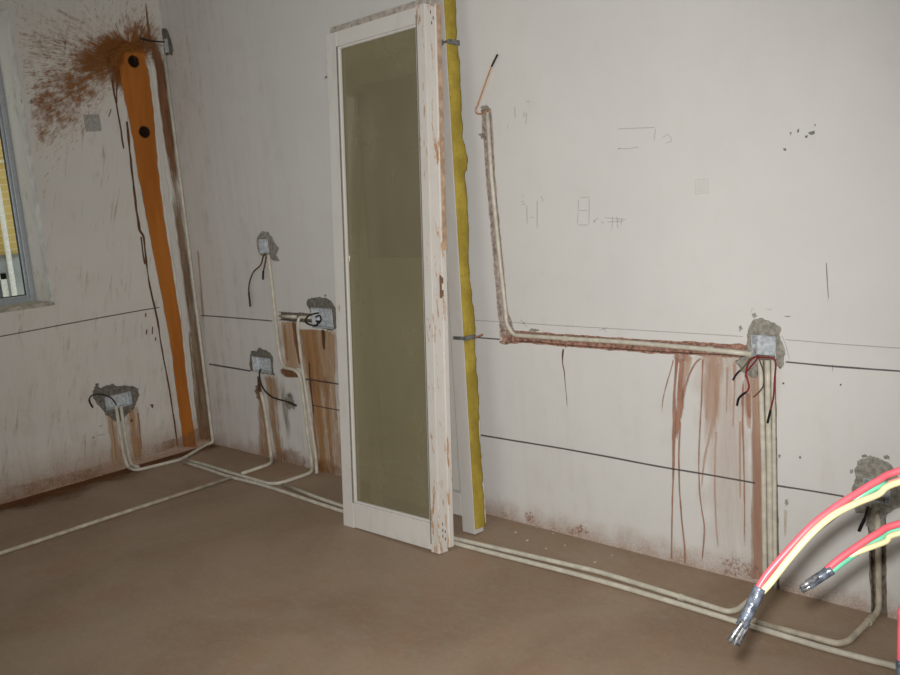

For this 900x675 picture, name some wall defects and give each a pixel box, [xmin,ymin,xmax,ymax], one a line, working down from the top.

rust [0,6,216,510]
rust [257,322,341,473]
rust [662,354,762,579]